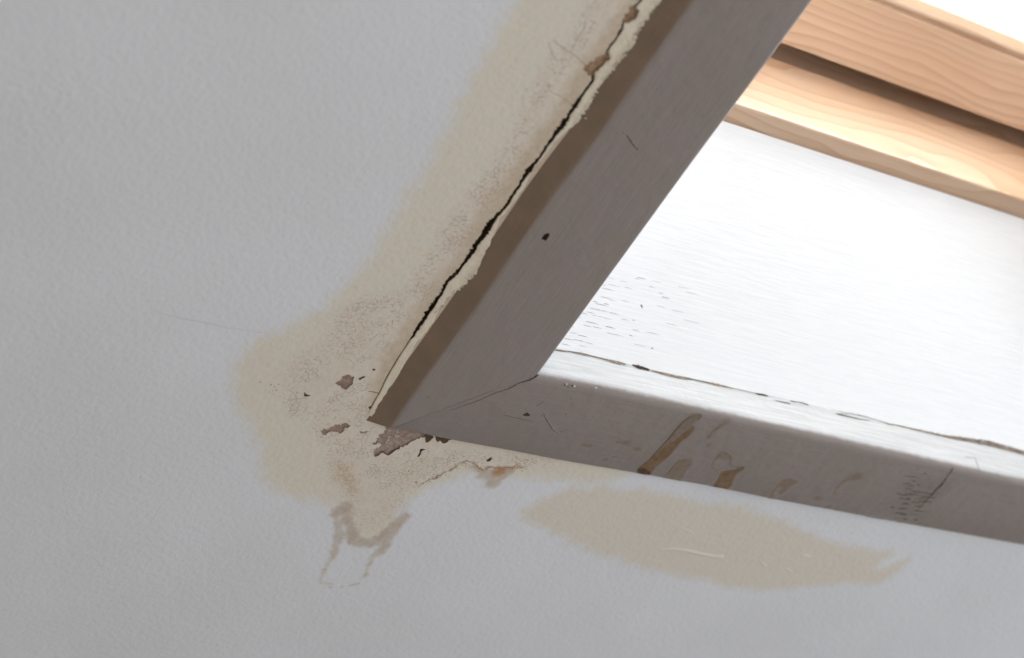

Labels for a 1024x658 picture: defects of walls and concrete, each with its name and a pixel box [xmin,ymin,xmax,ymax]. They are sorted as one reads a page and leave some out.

peeling [335,369,376,390]
peeling [321,423,452,457]
crack [283,0,642,489]
peeling [368,0,662,416]
damp [216,0,920,597]